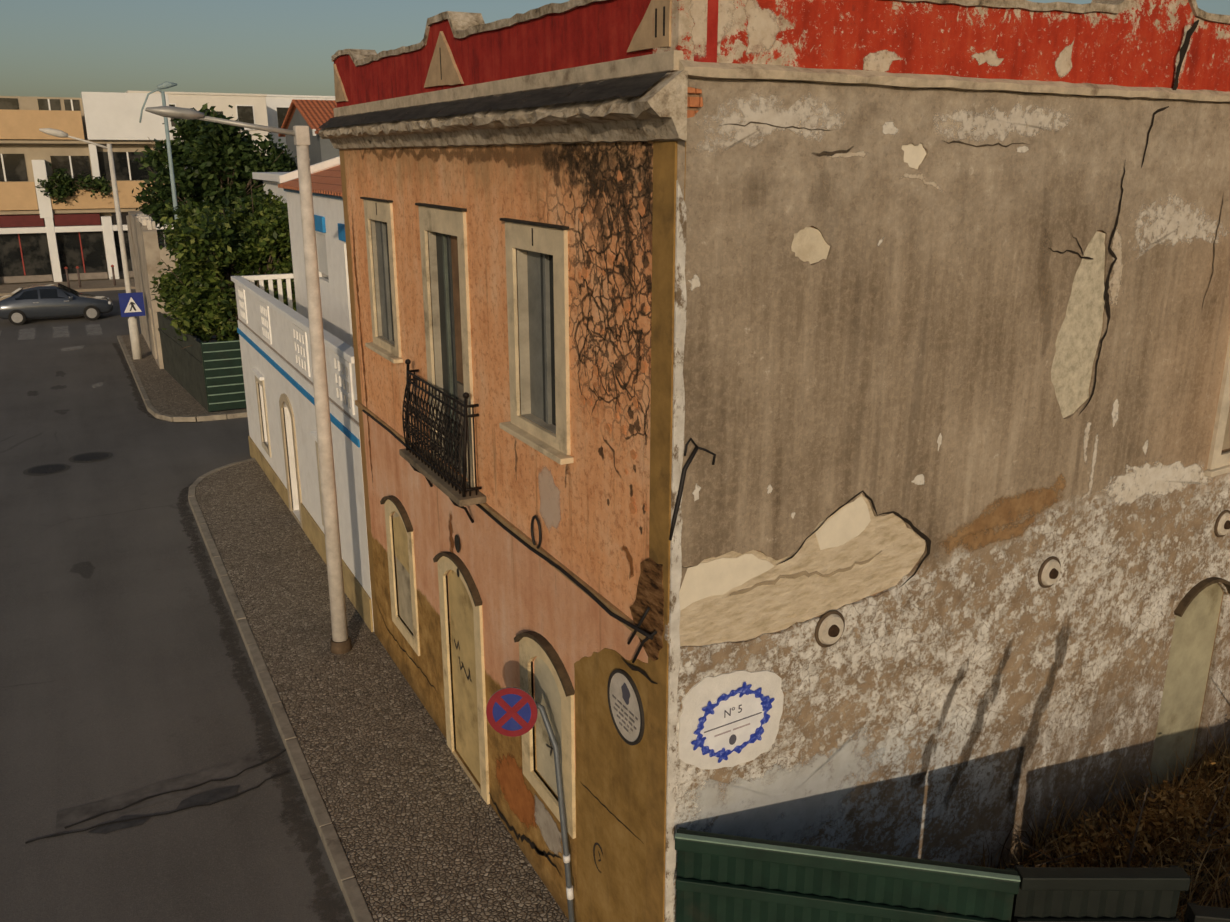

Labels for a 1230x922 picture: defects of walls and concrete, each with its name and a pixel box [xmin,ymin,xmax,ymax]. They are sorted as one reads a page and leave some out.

peeling [690,0,780,57]
spalling [791,227,830,264]
crack [1049,19,1199,416]
crack [1202,199,1223,308]
spalling [1051,231,1105,418]
spalling [621,558,664,684]
spalling [679,491,931,647]
leakage [943,474,1065,554]
leakage [912,670,964,785]
leakage [944,649,1009,807]
leakage [1009,628,1068,800]
crack [489,793,562,878]